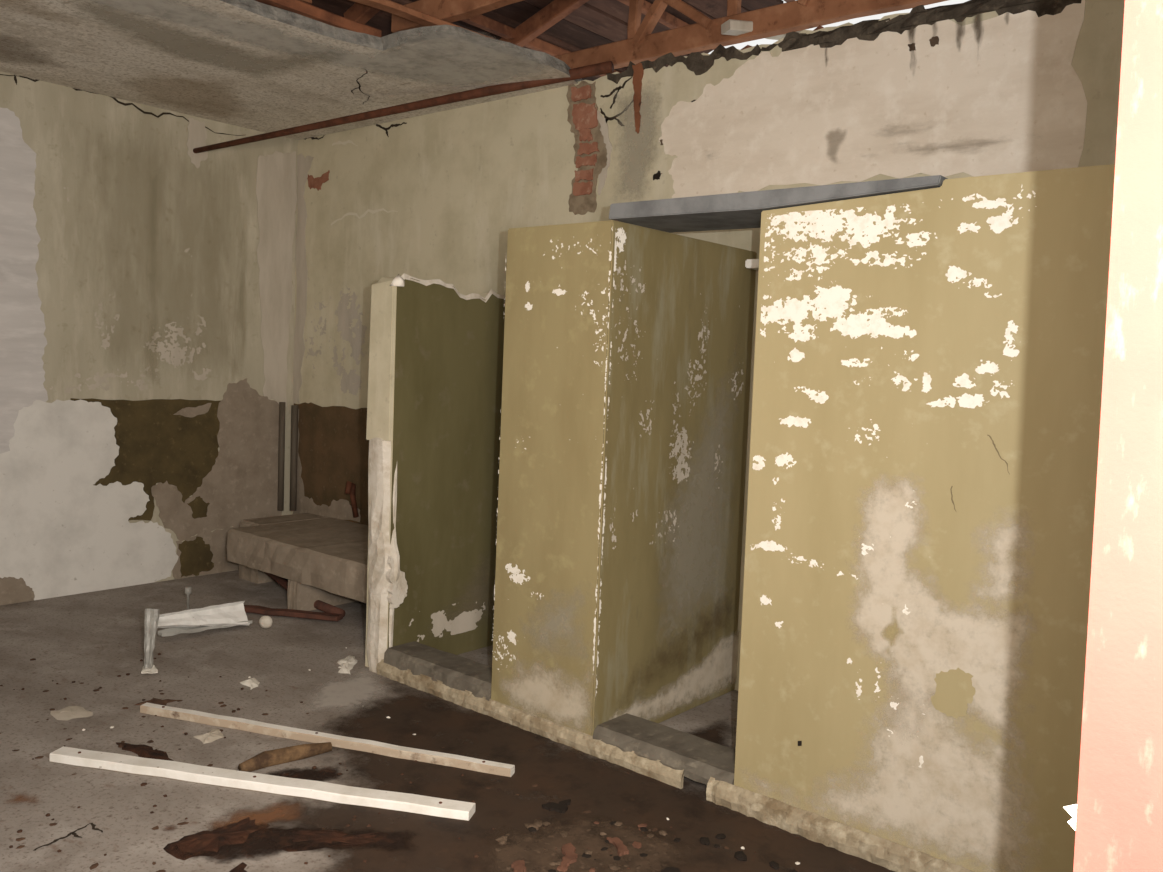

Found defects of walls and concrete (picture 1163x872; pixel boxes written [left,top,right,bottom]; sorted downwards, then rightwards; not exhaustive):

spalling [566,81,612,215]
crack [600,76,634,126]
peeling [653,0,1088,234]
peeling [760,202,937,362]
peeling [945,266,1002,298]
peeling [888,320,1019,408]
peeling [151,378,361,579]
spalling [543,228,646,693]
peeling [409,584,525,672]
leakage [504,664,588,728]
leakage [267,674,895,872]
leakage [823,480,1029,872]